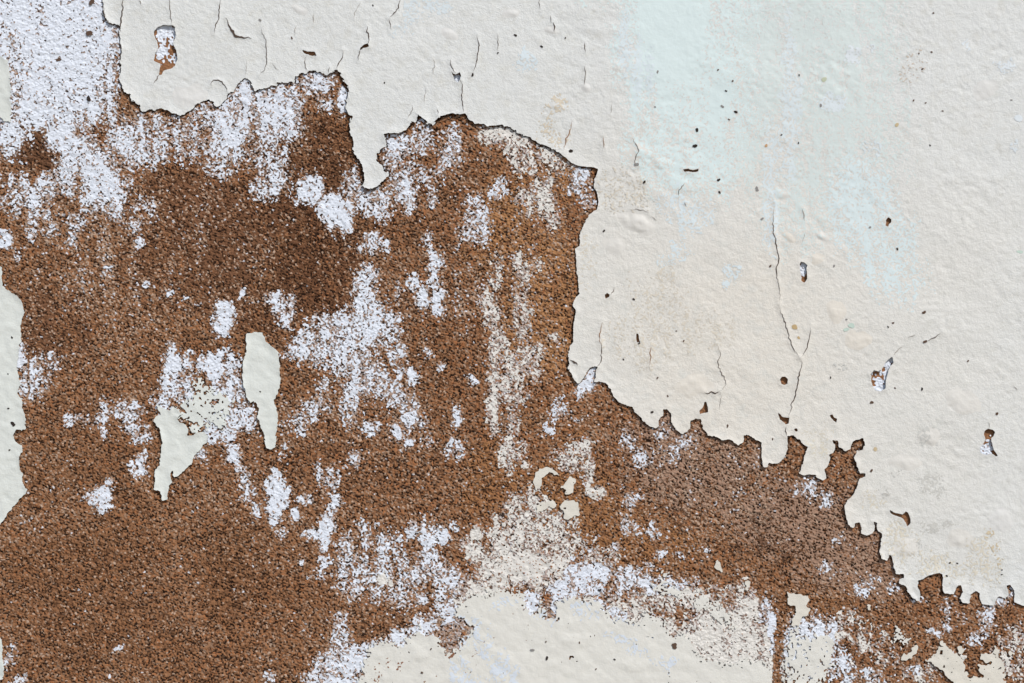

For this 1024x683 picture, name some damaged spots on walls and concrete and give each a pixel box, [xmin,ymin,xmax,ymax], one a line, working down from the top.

spalling [24,0,53,35]
spalling [82,19,106,49]
peeling [154,25,177,75]
spalling [64,70,88,106]
crack [409,38,499,115]
crack [772,210,811,435]
peeling [870,357,896,404]
peeling [980,429,997,456]
peeling [890,510,910,526]